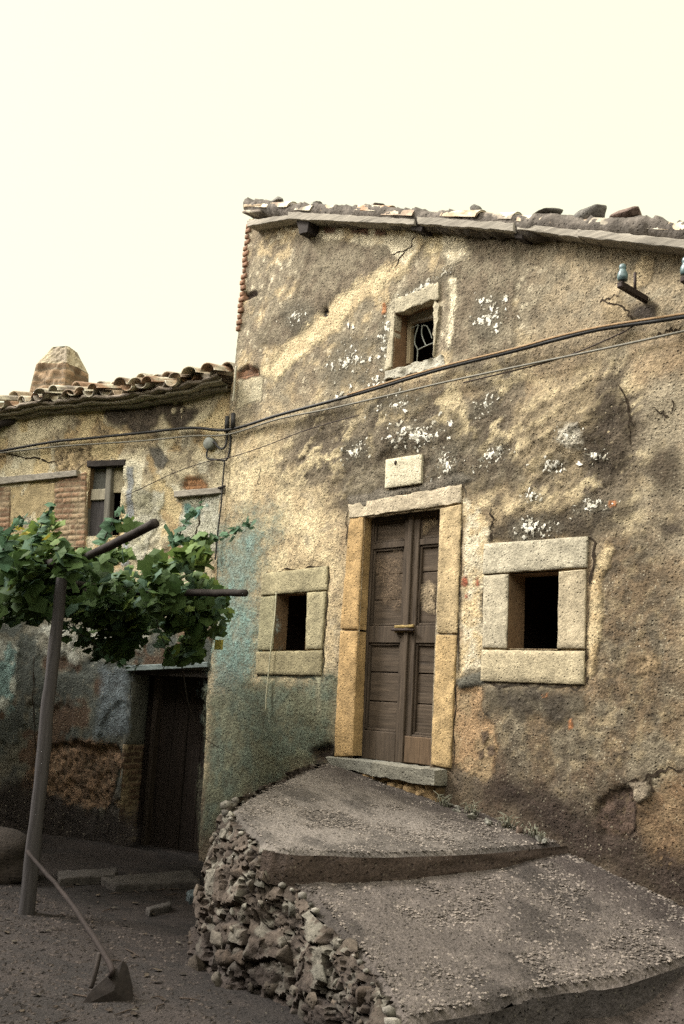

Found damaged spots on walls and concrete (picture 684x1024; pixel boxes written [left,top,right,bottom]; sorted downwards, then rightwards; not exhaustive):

crack [392,237,416,267]
flaking render [312,226,469,398]
peeling [470,293,508,334]
peeling [365,388,515,482]
peeling [543,448,609,473]
peeling [514,487,620,539]
flaking render [596,774,684,865]